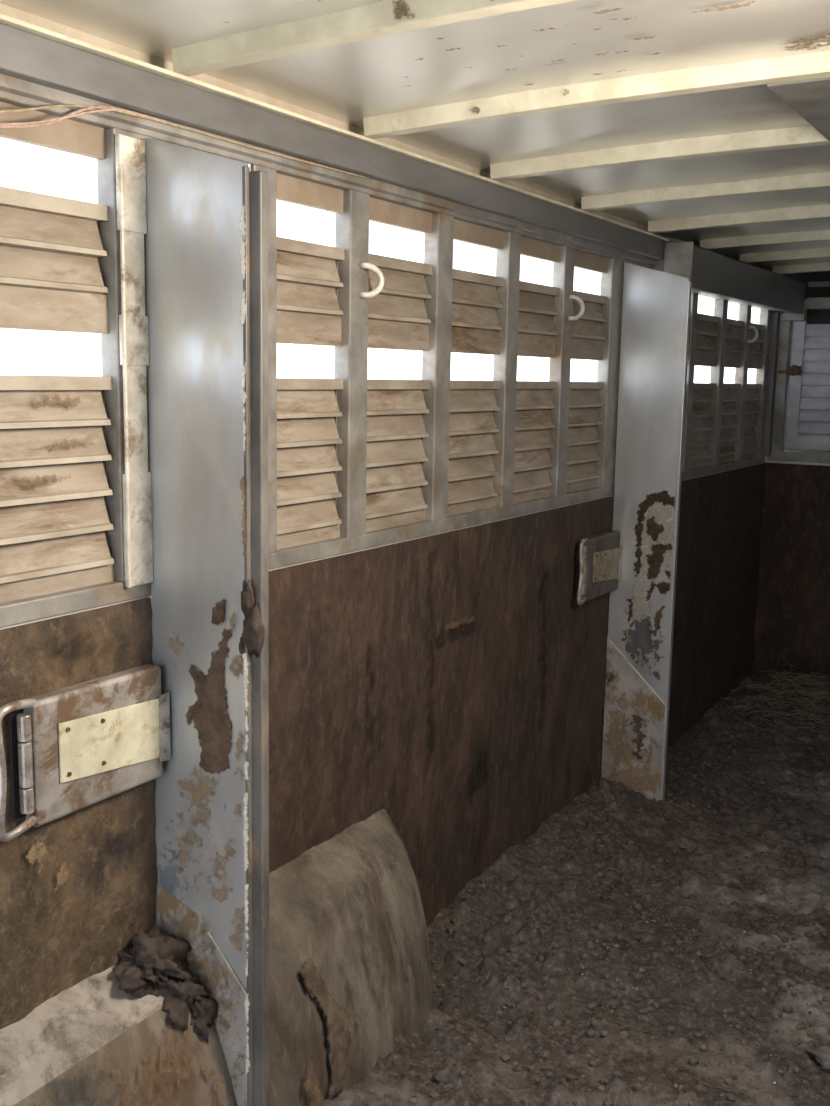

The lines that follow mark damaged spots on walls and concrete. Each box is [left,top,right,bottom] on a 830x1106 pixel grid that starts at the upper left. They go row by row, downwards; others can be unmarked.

peeling [784,43,830,51]
peeling [626,490,676,628]
peeling [211,599,235,629]
corrosion [604,692,653,791]
corrosion [171,771,234,902]
corrosion [229,908,245,951]